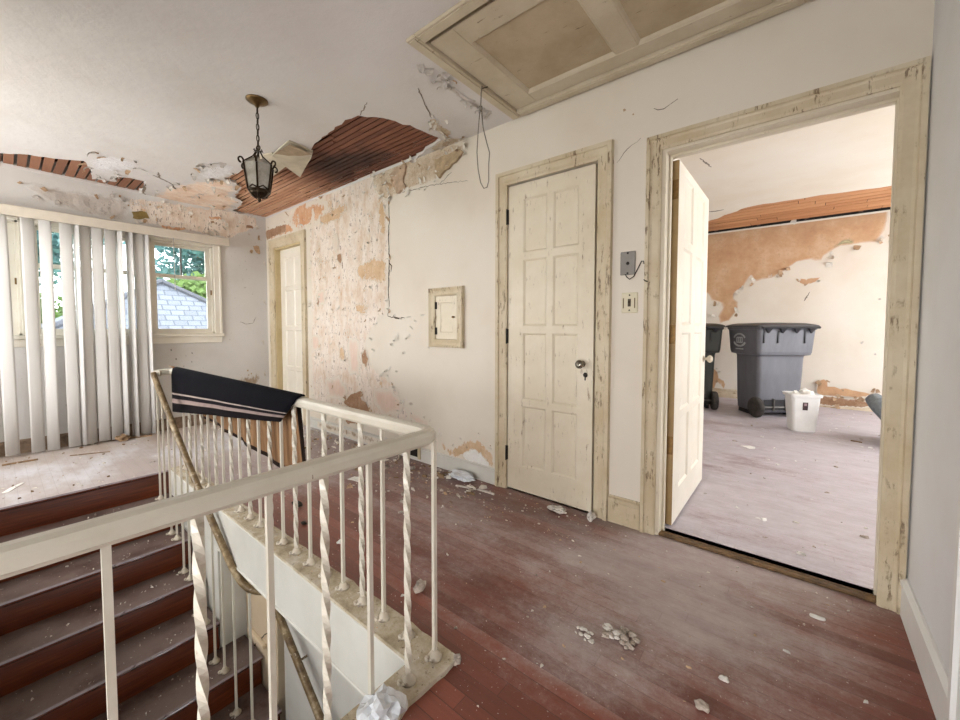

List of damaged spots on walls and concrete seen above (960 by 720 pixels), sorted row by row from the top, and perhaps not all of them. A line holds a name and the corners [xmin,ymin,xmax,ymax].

peeling [416,64,492,120]
peeling [77,151,148,182]
peeling [126,115,495,468]
crack [388,174,467,319]
peeling [707,212,890,330]
spalling [815,379,880,409]